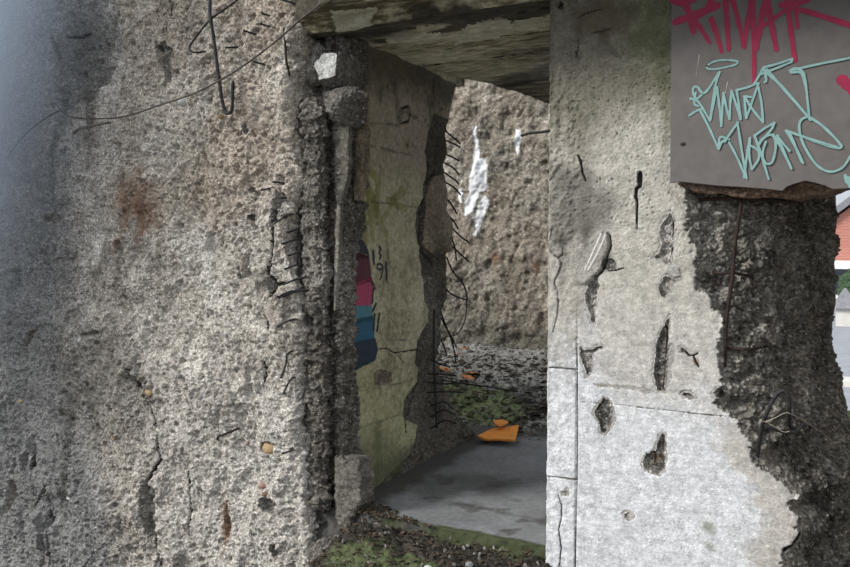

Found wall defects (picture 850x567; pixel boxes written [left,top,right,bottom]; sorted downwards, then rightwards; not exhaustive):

peeling [330,0,378,32]
peeling [454,16,547,45]
efflorescence [458,126,489,238]
spalling [379,107,518,485]
crack [549,248,564,333]
crack [124,368,163,489]
crack [548,338,598,567]
spalling [592,397,616,436]
spalling [577,314,689,394]
spalling [641,432,668,477]
crack [620,405,722,417]
spalling [650,181,850,567]